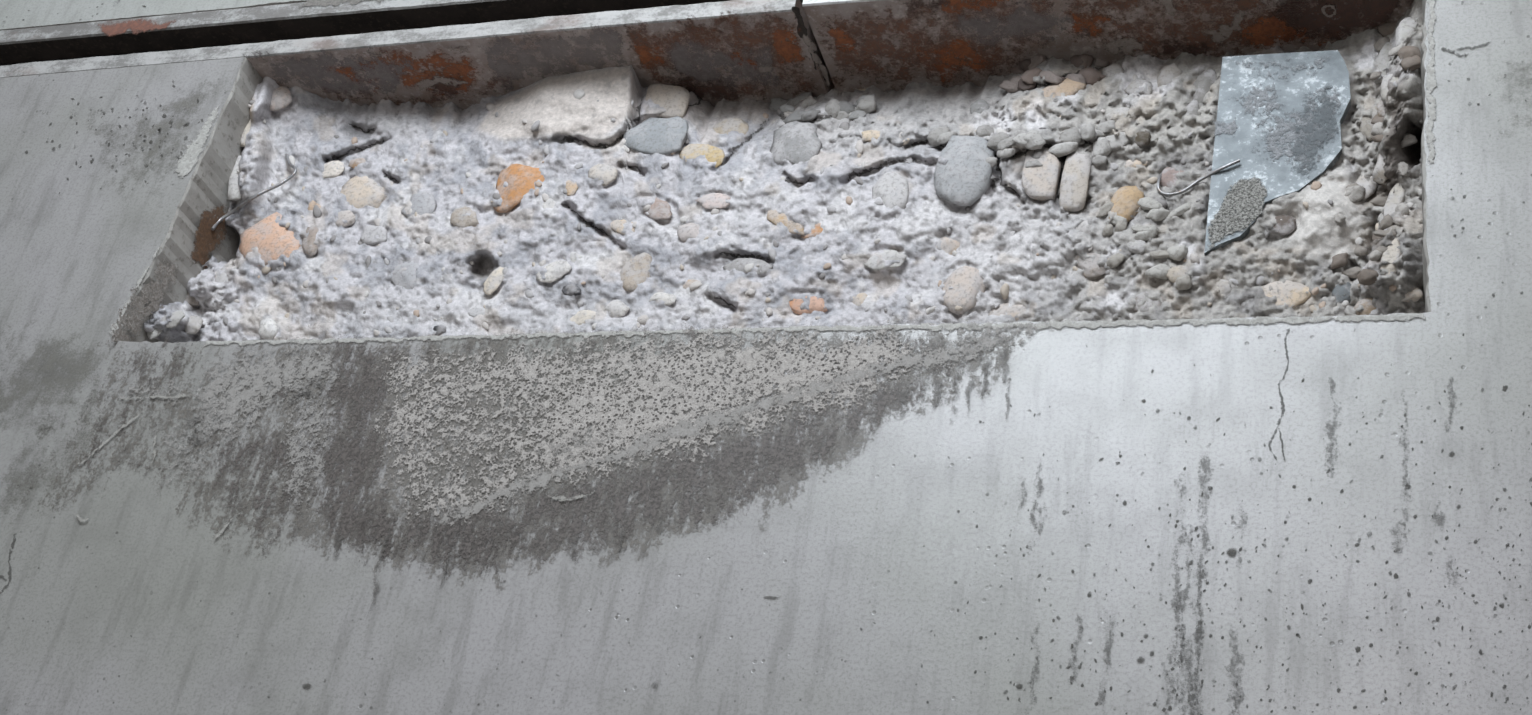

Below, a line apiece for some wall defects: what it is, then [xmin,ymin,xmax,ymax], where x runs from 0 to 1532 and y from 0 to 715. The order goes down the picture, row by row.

rust [323,47,512,106]
crack [778,7,832,122]
rust [626,0,1414,102]
spalling [144,0,1437,346]
crack [1268,329,1290,460]
damp [27,326,1016,601]
crack [0,536,16,592]